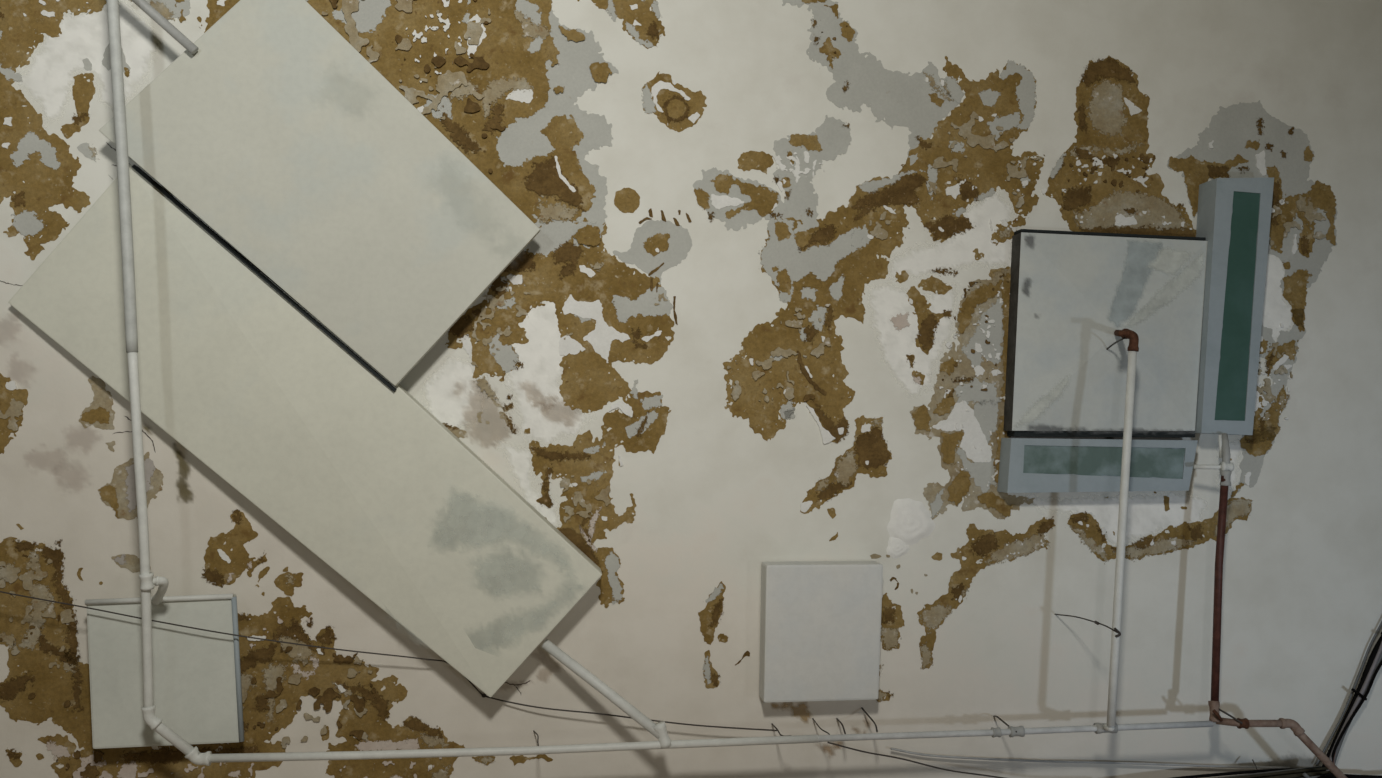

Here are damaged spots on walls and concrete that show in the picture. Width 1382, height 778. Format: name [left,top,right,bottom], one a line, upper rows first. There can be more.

peeling [0,0,131,260]
peeling [130,0,240,33]
spalling [642,72,707,132]
peeling [0,373,28,454]
peeling [79,376,164,520]
peeling [306,0,692,608]
peeling [693,0,1338,702]
peeling [0,509,553,778]